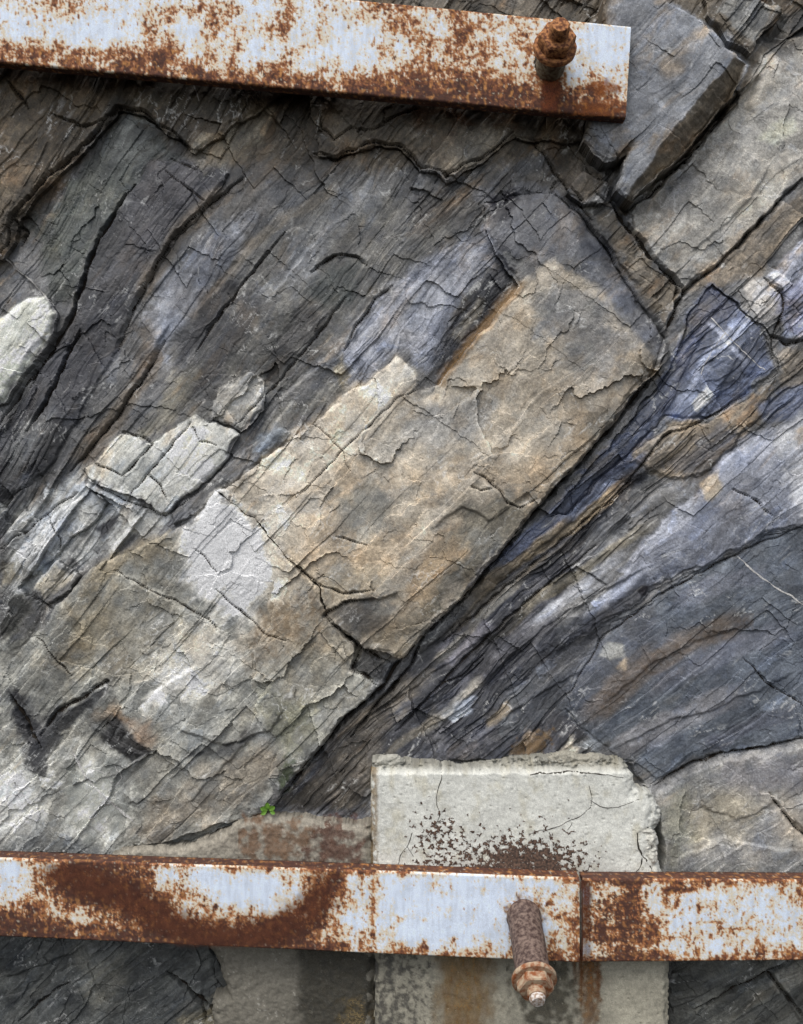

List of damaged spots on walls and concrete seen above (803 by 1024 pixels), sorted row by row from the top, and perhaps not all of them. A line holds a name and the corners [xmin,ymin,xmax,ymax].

rust [541,80,560,111]
rust [584,78,618,114]
rust [48,865,333,945]
rust [573,881,601,1021]
rust [436,956,490,1024]